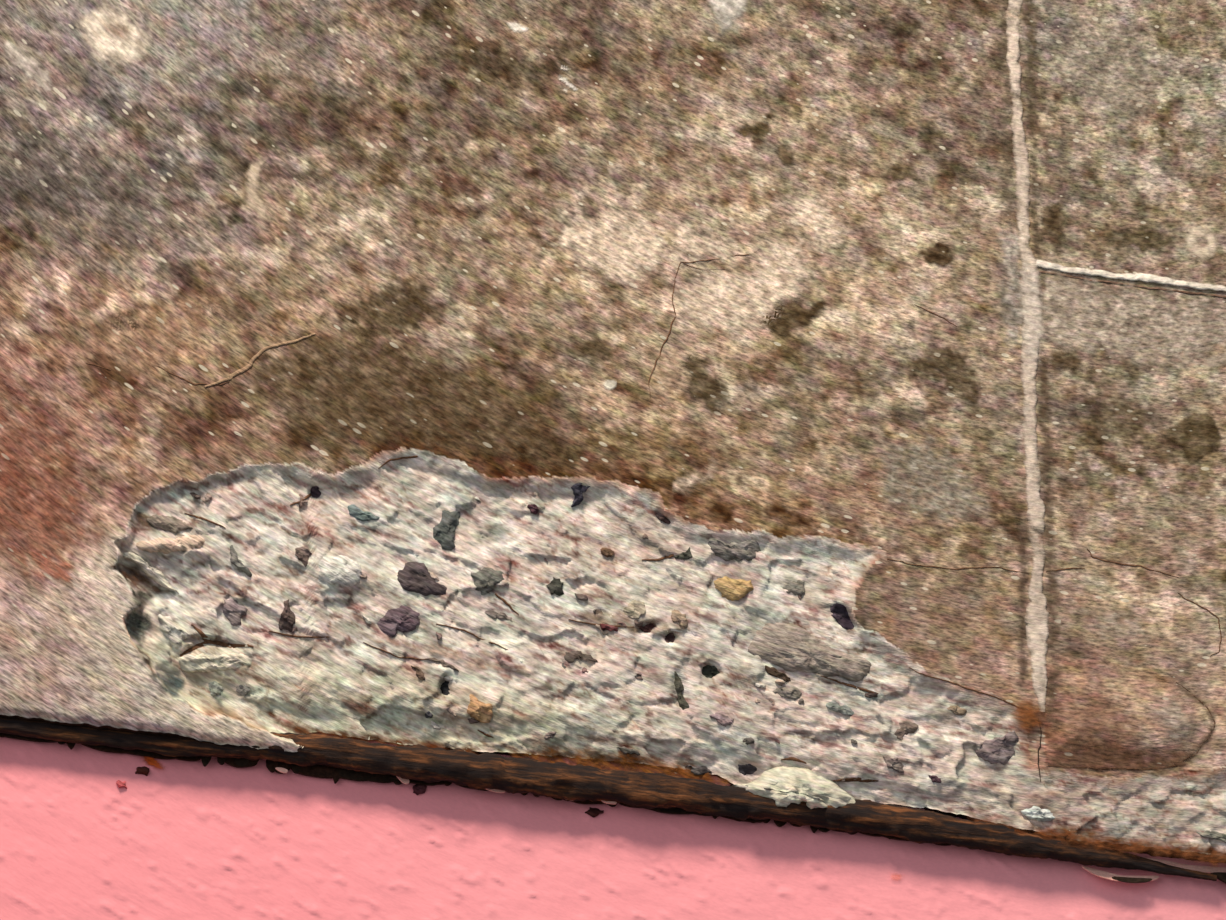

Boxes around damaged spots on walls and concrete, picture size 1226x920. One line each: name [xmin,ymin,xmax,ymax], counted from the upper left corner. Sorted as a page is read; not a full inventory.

crack [1180,338,1226,365]
rust [0,410,85,581]
rust [0,711,1226,881]
spalling [111,448,1226,884]
rust [1012,701,1041,731]